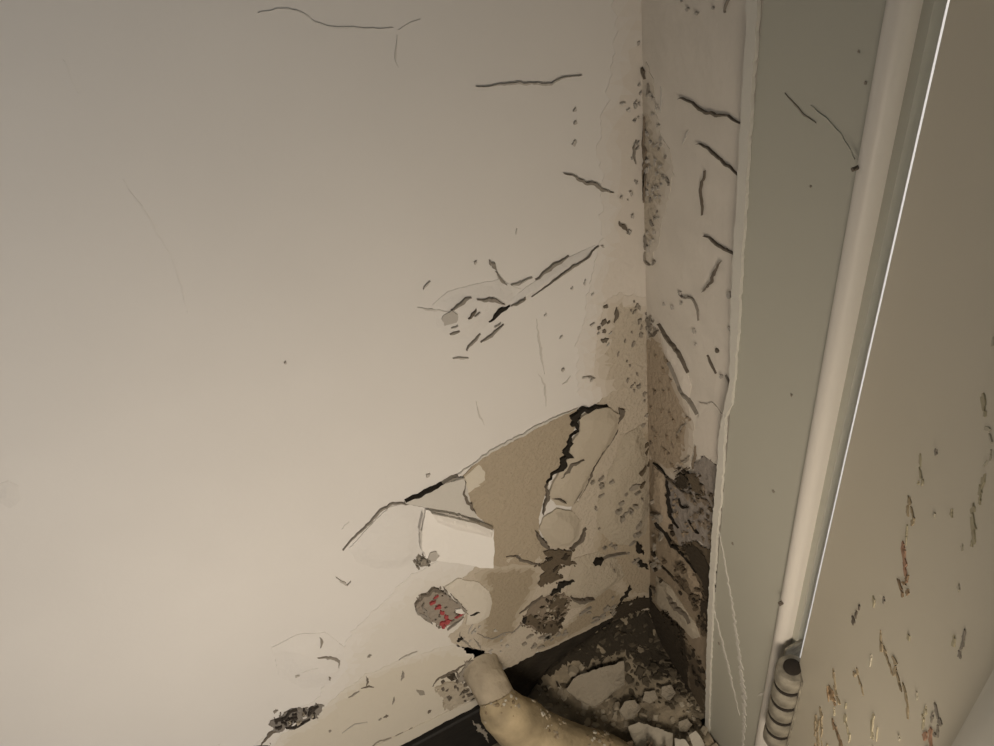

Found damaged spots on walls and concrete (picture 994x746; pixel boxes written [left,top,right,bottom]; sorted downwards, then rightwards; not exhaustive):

crack [476,75,583,88]
crack [678,97,740,321]
damp [301,0,717,714]
crack [417,245,605,402]
crack [648,323,730,435]
crack [342,473,481,554]
peeling [404,407,579,568]
crack [506,404,627,566]
spalling [668,402,723,550]
damp [255,728,289,746]
peeling [259,578,509,746]
crack [422,579,595,687]